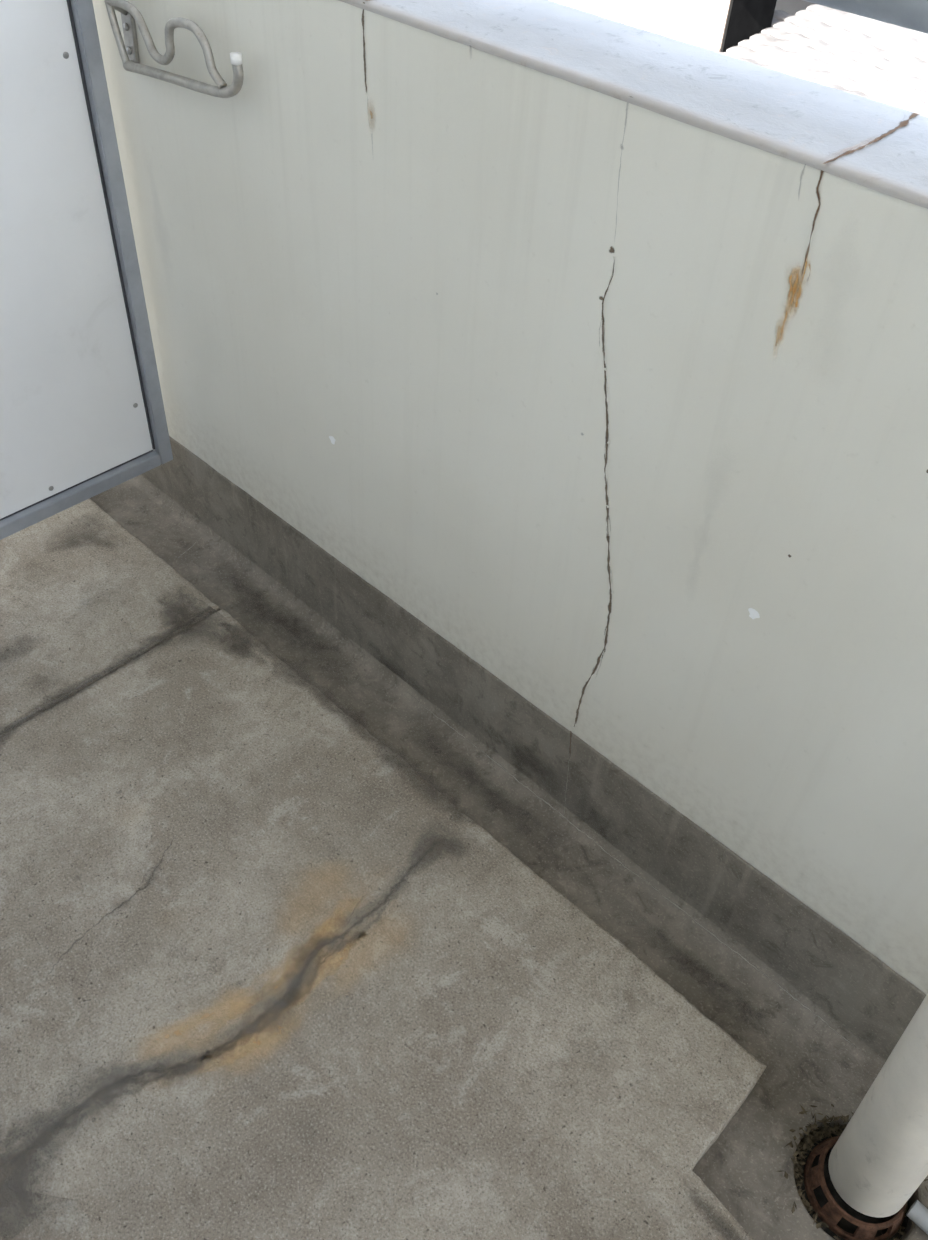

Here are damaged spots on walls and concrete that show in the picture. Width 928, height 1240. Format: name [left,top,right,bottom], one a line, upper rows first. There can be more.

crack [362,0,370,96]
crack [798,113,919,282]
corrosion [777,262,810,340]
crack [415,256,854,1046]